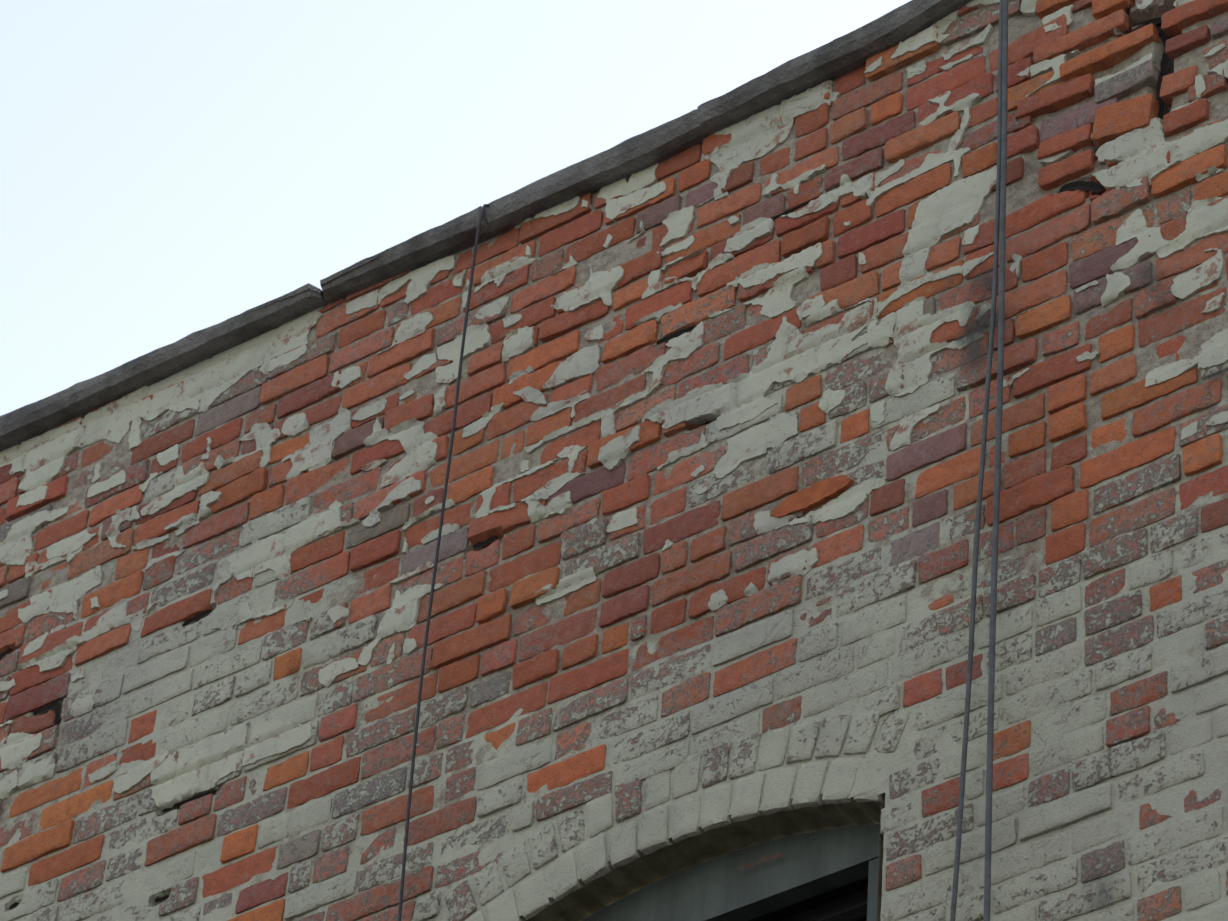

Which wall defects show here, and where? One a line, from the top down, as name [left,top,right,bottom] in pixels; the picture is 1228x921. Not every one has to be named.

peeling [864,0,1075,79]
peeling [1015,50,1080,98]
crack [1126,3,1172,119]
peeling [1090,44,1228,190]
peeling [1075,197,1228,314]
peeling [0,80,997,597]
peeling [1145,328,1228,388]
peeling [0,565,157,692]
peeling [318,562,445,688]
peeling [535,567,597,606]
peeling [0,720,57,800]
peeling [88,718,313,811]